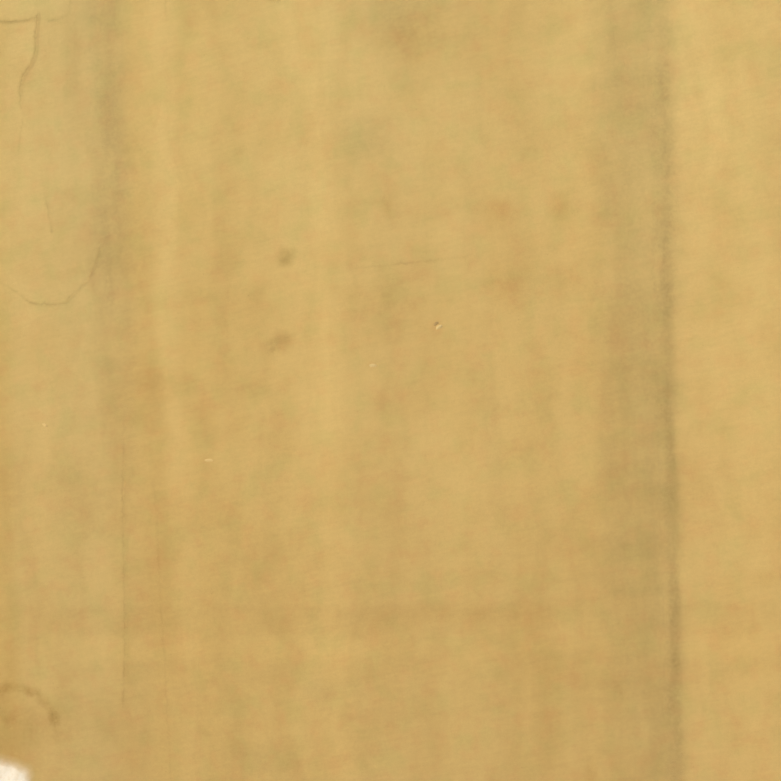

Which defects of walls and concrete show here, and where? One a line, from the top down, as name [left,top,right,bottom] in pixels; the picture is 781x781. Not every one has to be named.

spalling [0,751,37,781]